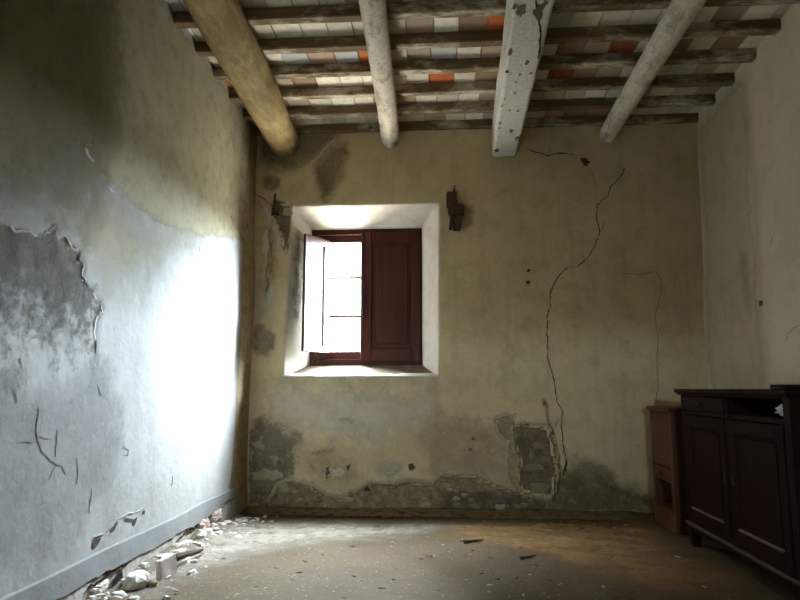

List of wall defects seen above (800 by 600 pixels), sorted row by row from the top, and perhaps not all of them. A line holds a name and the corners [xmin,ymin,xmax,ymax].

peeling [512,0,548,21]
peeling [0,222,105,353]
leakage [0,0,414,514]
crack [527,148,625,476]
crack [19,407,92,513]
flaking render [265,412,561,510]
flaking render [59,498,236,600]